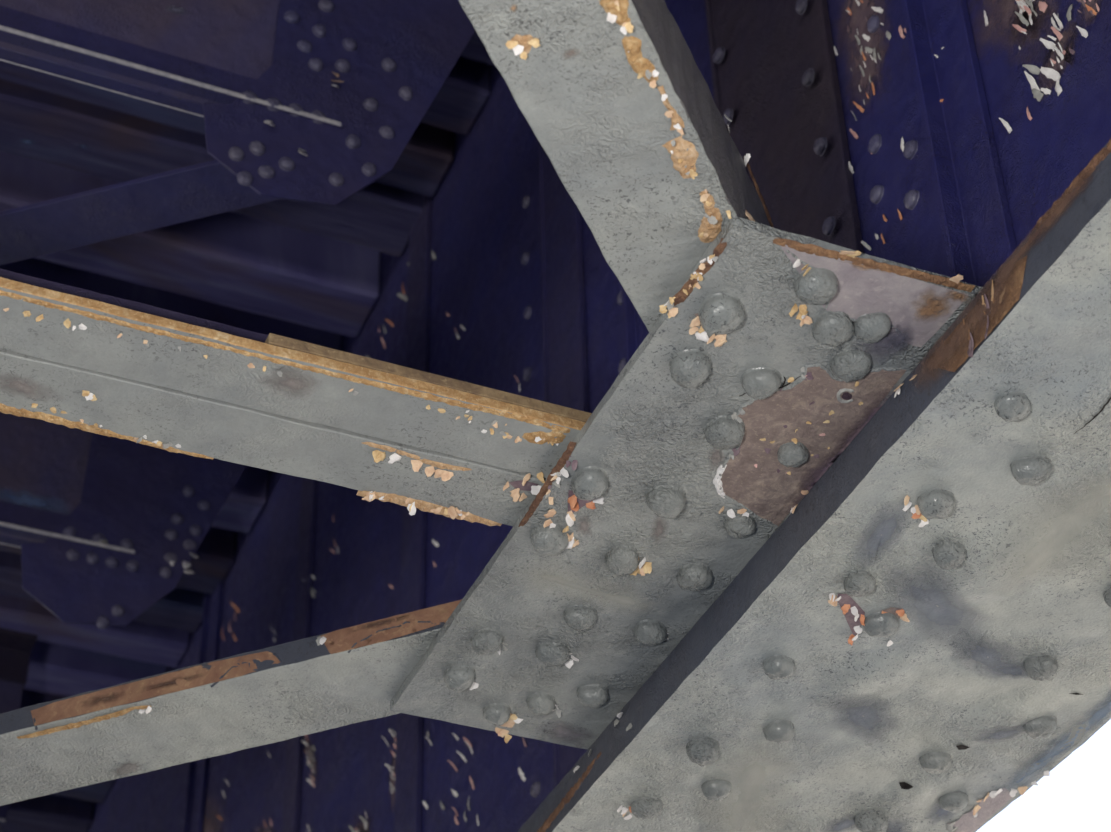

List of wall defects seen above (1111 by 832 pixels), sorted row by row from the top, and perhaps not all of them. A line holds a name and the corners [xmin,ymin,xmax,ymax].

peeling [982,0,1100,121]
corrosion [743,139,1111,377]
spalling [82,390,97,401]
crack [1074,397,1111,434]
peeling [362,442,471,481]
peeling [713,364,917,526]
peeling [543,490,604,549]
peeling [828,593,865,645]
peeling [881,607,910,622]
corrosion [17,705,152,739]
peeling [945,771,1050,832]